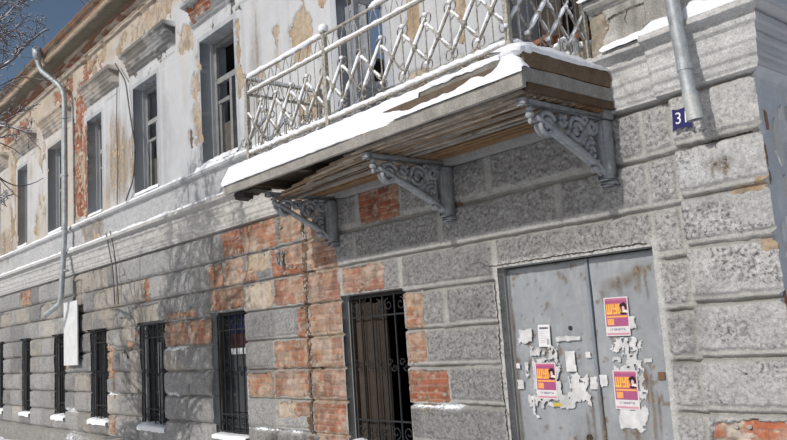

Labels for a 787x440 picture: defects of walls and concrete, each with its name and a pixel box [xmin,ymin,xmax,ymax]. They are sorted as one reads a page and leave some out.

spalling [52,0,173,221]
flaking render [178,0,212,149]
flaking render [205,0,245,99]
flaking render [272,0,322,71]
spalling [358,183,400,226]
crack [607,2,644,23]
peeling [730,104,787,198]
spalling [121,199,385,440]
crack [300,222,325,440]
spalling [404,290,451,403]
crack [478,243,647,440]
spalling [713,418,787,440]